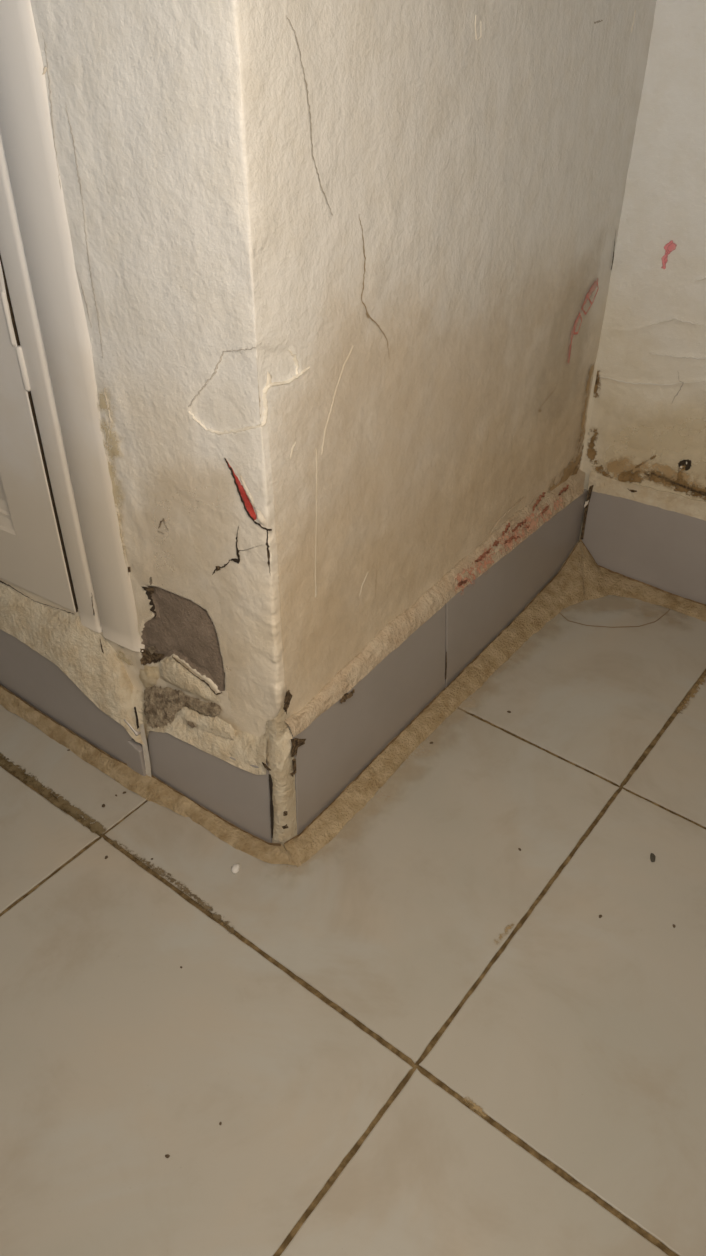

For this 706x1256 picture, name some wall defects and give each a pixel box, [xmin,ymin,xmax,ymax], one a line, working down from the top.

crack [286,15,390,358]
crack [212,527,257,575]
peeling [455,485,569,590]
flaking render [139,577,236,739]
peeling [283,690,292,714]
peeling [290,738,306,777]